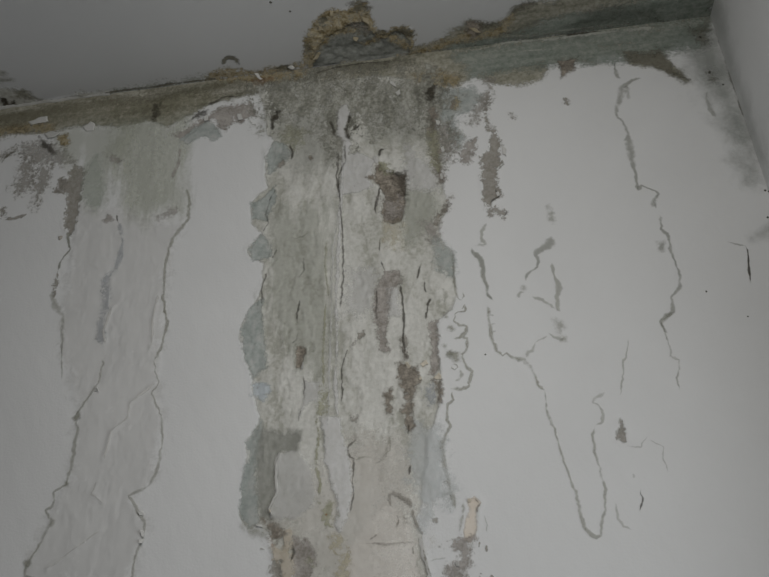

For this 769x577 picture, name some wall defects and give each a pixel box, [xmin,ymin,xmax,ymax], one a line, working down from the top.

flaking render [173,0,457,577]
leakage [0,0,714,297]
peeling [445,497,481,577]